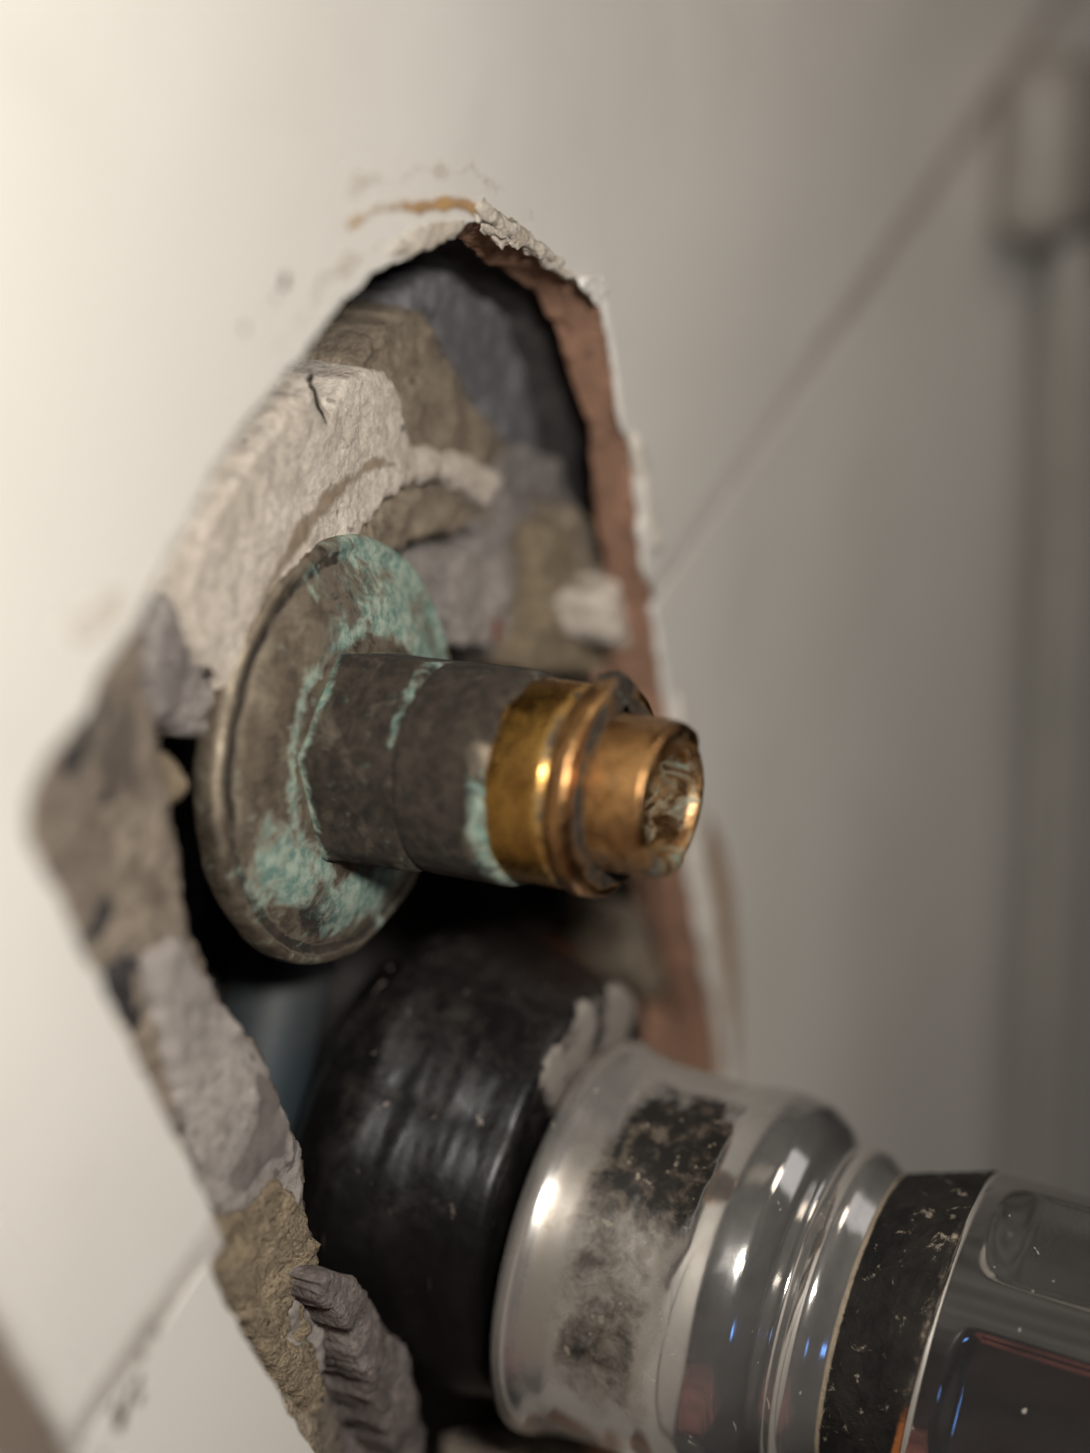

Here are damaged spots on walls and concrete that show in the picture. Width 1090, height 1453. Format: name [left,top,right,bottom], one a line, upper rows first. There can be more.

spalling [25,198,738,1453]